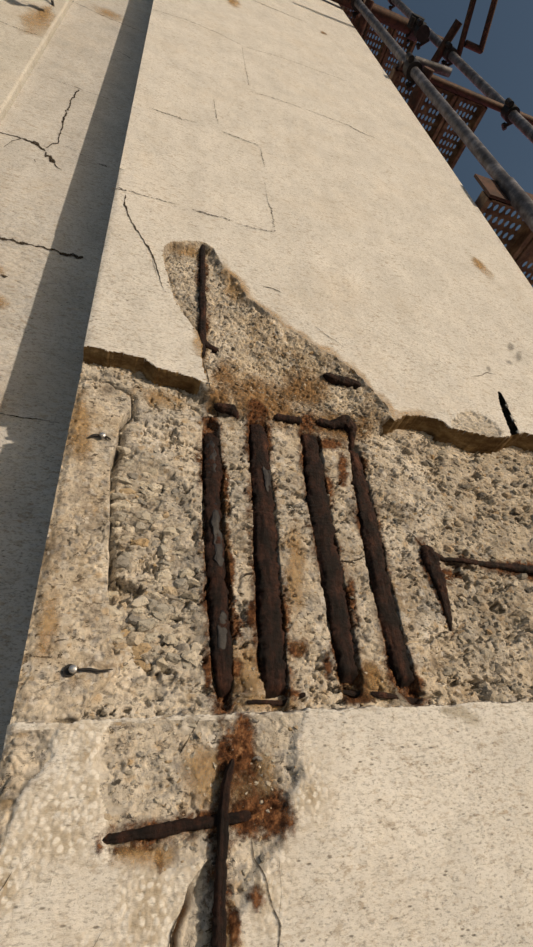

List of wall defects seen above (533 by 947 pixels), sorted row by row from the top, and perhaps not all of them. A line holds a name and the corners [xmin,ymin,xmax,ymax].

crack [0,87,91,169]
crack [0,237,83,259]
crack [79,153,276,289]
corrosion [181,247,209,292]
spalling [0,240,533,947]
corrosion [442,555,533,585]
corrosion [96,366,370,947]
corrosion [322,626,429,706]
crack [251,839,281,947]